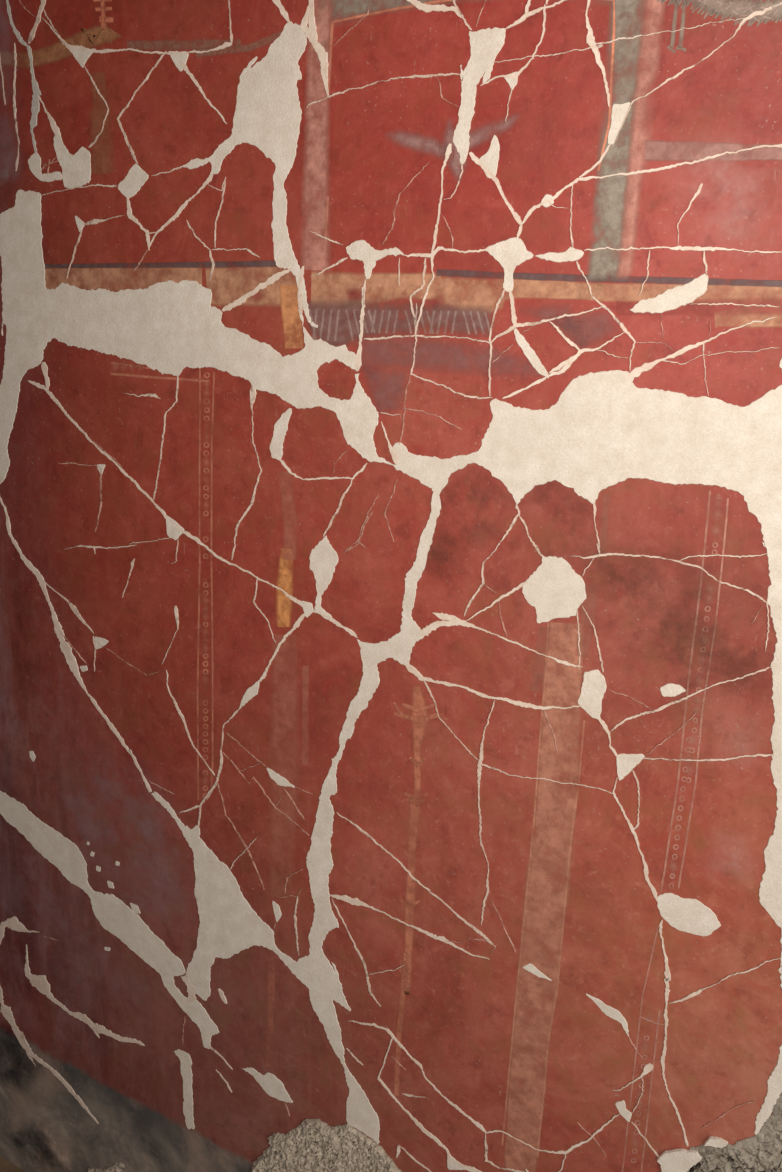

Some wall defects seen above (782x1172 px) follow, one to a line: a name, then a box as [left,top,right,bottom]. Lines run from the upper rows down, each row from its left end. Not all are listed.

crack [28,0,233,278]
spalling [0,0,418,560]
crack [209,248,260,280]
crack [272,0,369,97]
crack [310,0,782,444]
spalling [630,274,777,314]
crack [28,362,398,836]
spalling [0,317,782,1148]
crack [272,869,302,955]
crack [330,813,516,959]
crack [0,916,145,1124]
crack [346,1020,660,1172]